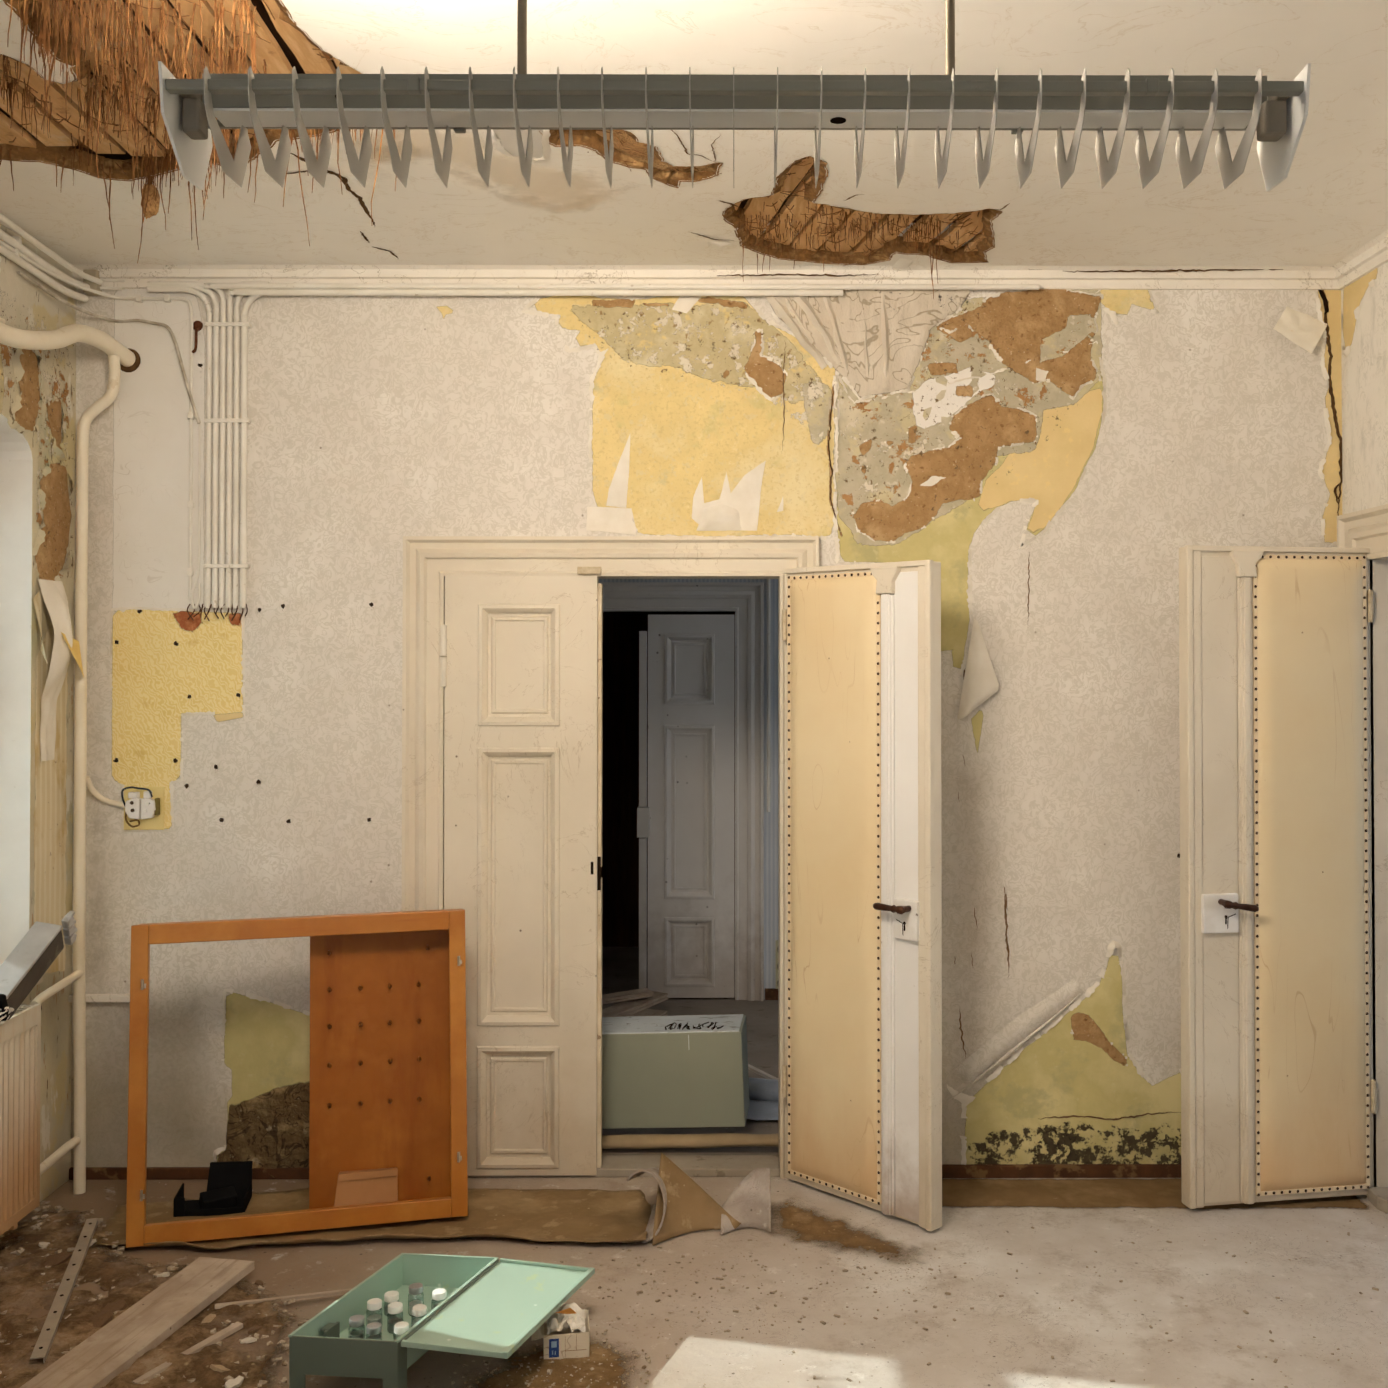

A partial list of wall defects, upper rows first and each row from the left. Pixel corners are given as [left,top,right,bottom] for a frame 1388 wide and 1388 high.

crack [287,153,398,258]
spalling [0,343,75,581]
flaking render [571,289,1104,546]
crack [1322,290,1343,516]
spalling [1070,1012,1128,1066]
spalling [218,1082,310,1178]
water stain [968,1112,1181,1164]